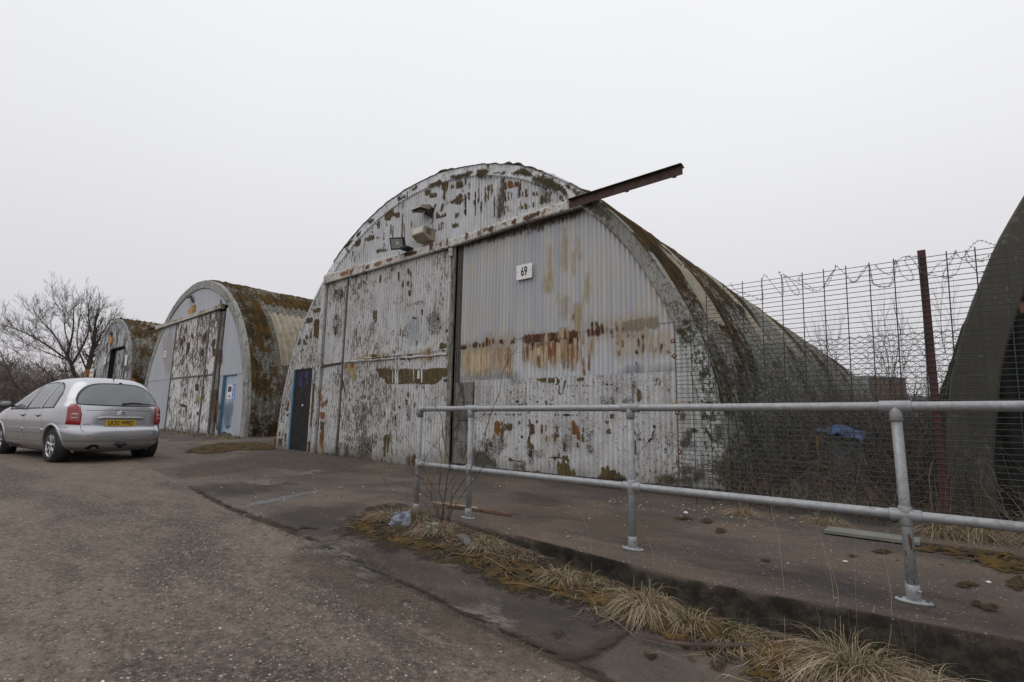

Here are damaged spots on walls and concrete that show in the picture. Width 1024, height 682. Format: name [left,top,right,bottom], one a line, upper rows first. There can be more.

peeling [355,209,412,253]
peeling [425,178,564,231]
peeling [180,328,219,356]
peeling [303,289,344,345]
peeling [379,266,448,352]
rust [460,281,670,379]
peeling [376,367,448,421]